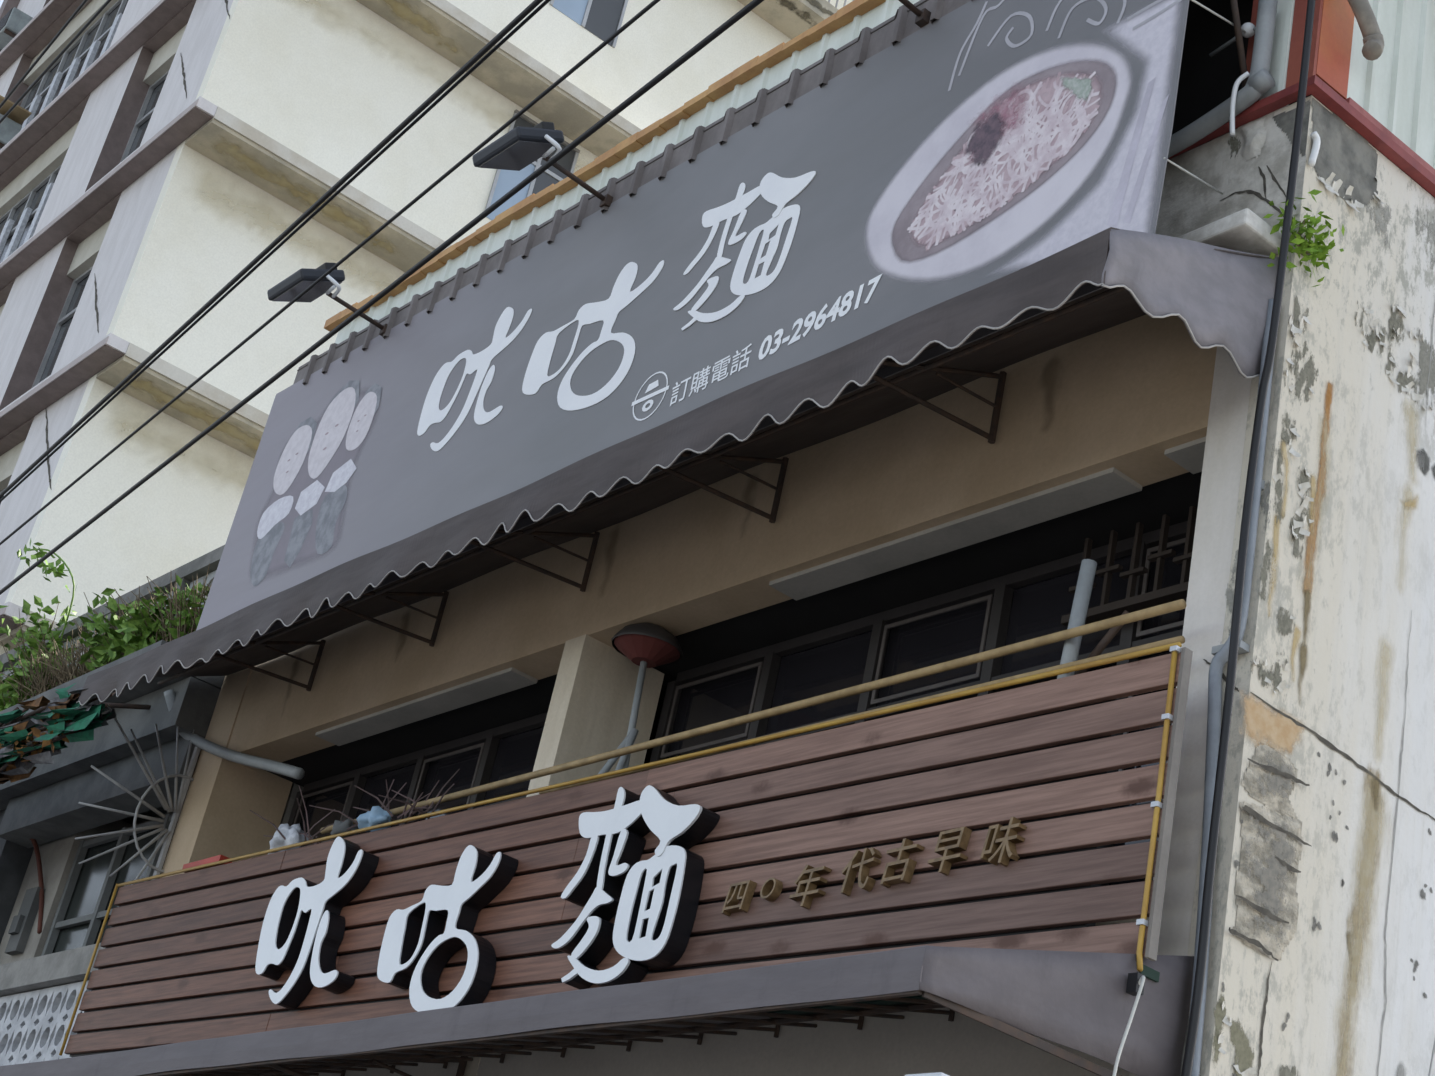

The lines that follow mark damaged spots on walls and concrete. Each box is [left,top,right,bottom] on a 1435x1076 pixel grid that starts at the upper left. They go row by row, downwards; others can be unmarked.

damp [780,0,834,24]
crack [180,56,188,98]
crack [92,273,100,333]
peeling [1355,300,1416,392]
crack [44,408,52,489]
peeling [1271,296,1319,560]
damp [1260,442,1288,615]
peeling [1259,539,1295,636]
peeling [1251,653,1290,701]
flaking render [1233,742,1322,960]
crack [1203,612,1435,1076]